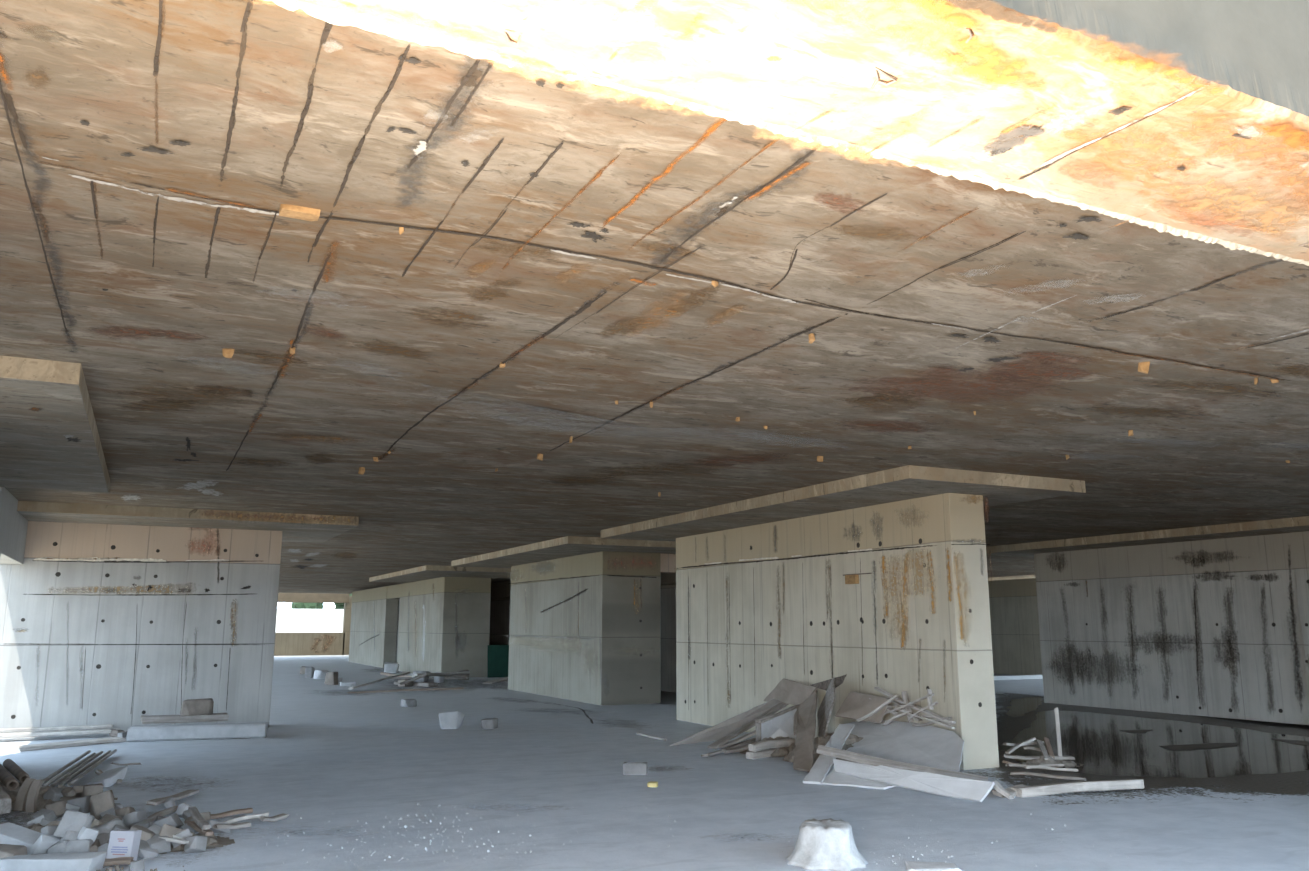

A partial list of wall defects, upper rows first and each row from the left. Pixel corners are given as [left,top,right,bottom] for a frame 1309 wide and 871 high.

corrosion [841,0,1225,94]
crack [0,0,333,346]
corrosion [487,48,727,226]
corrosion [632,112,922,247]
corrosion [1061,115,1309,234]
crack [308,46,1309,460]
corrosion [885,556,908,647]
corrosion [927,550,964,639]
leakage [1053,551,1238,707]